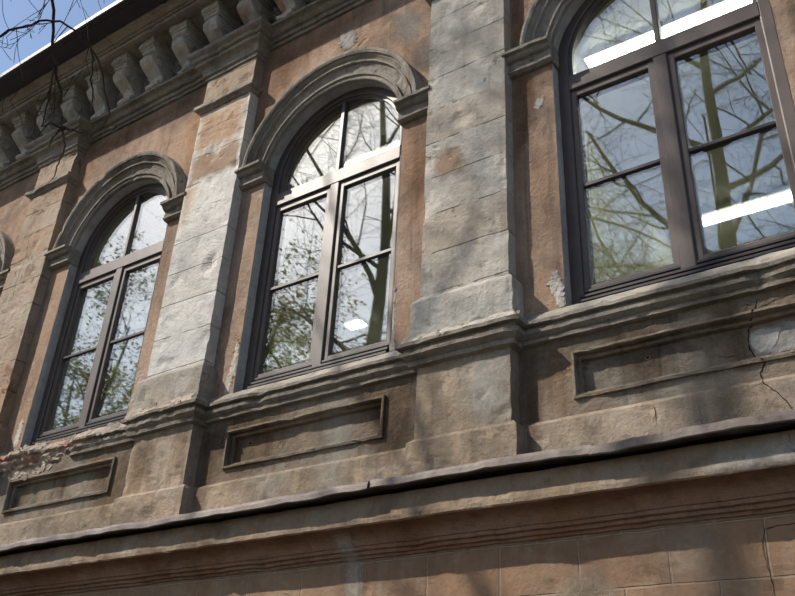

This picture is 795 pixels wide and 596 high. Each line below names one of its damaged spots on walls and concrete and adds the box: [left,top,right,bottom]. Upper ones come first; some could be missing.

flaking render [546,271,566,307]
crack [725,294,792,409]
peeling [748,321,795,357]
flaking render [0,367,198,481]
crack [762,523,795,595]